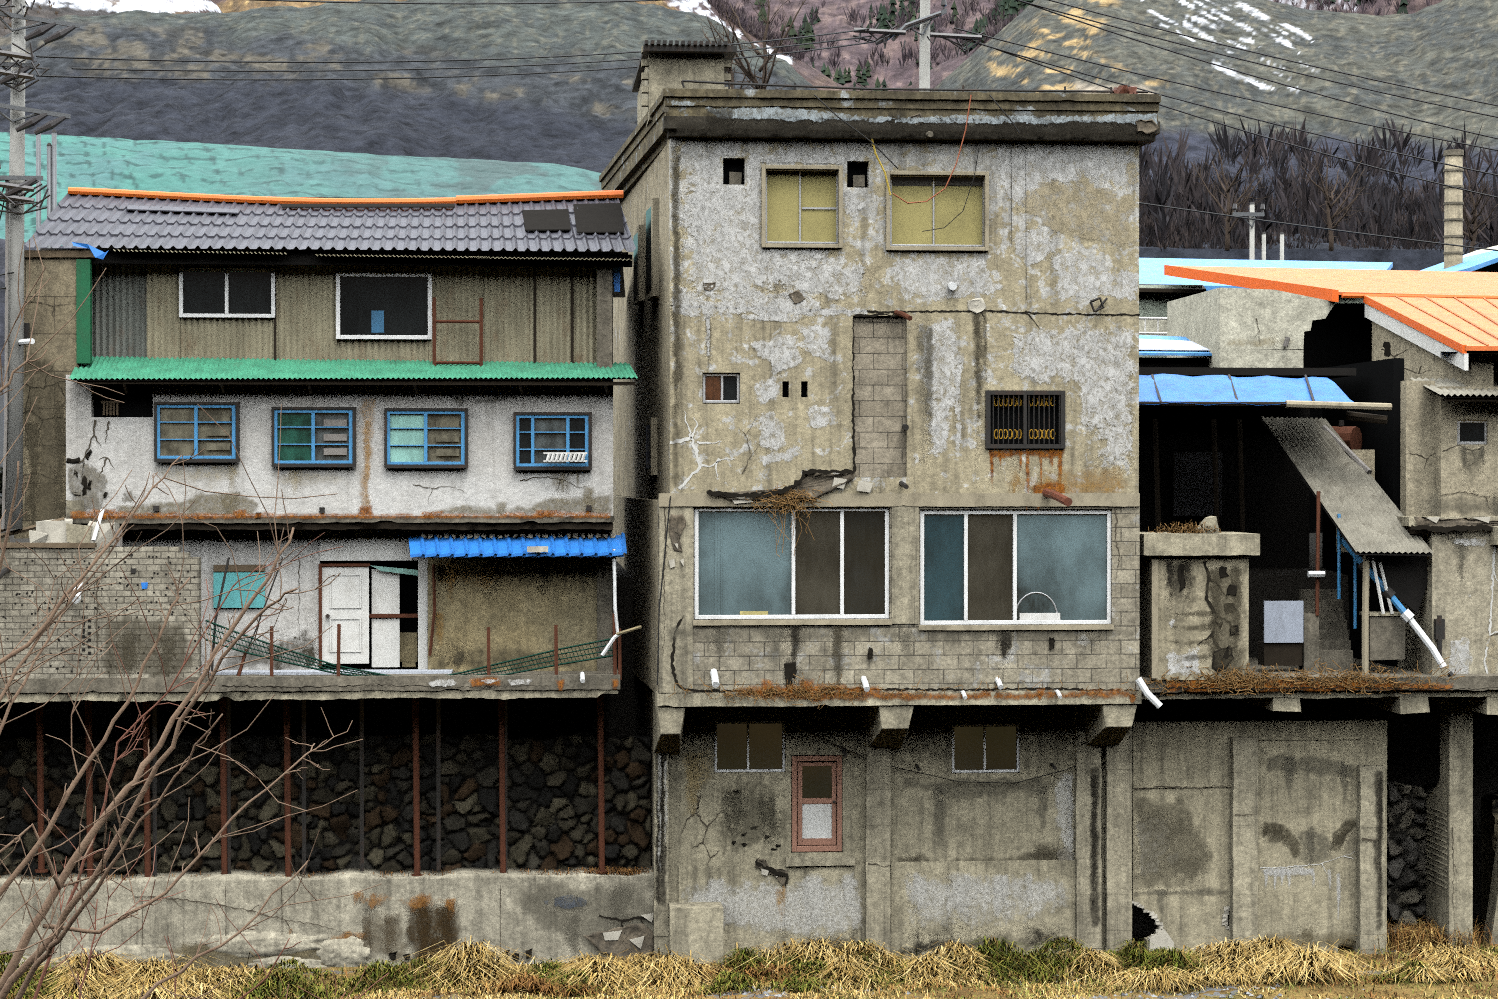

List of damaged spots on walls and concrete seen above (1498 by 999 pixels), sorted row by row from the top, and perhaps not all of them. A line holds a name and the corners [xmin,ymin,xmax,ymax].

peeling [672,101,1159,134]
peeling [672,140,1002,466]
peeling [1006,324,1138,469]
peeling [29,449,135,547]
crack [662,305,1140,693]
rust [989,448,1120,508]
crack [818,401,1498,696]
rust [409,894,455,915]
crack [755,857,789,887]
leakage [1138,798,1225,914]
leakage [1263,820,1356,913]
leakage [1374,771,1383,929]